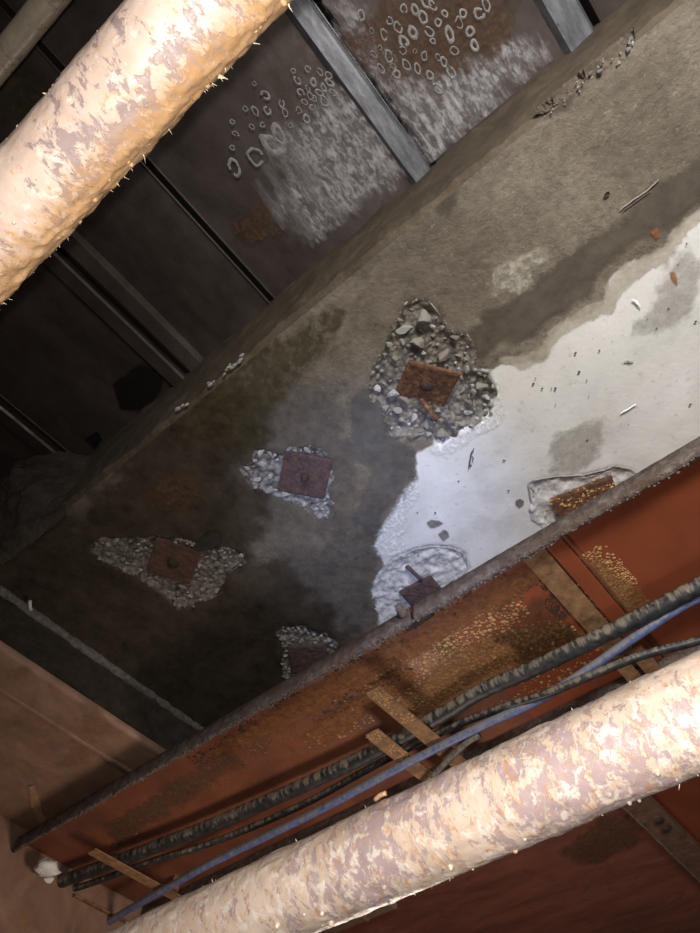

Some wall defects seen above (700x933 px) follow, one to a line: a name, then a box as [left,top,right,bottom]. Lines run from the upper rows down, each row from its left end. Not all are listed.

damp [0,0,700,728]
spalling [368,300,498,441]
spalling [240,446,335,519]
spalling [520,465,637,529]
rust [546,477,615,514]
spalling [90,536,246,611]
spalling [371,545,472,621]
rust [579,546,650,614]
spalling [275,626,339,679]
rust [301,594,576,761]